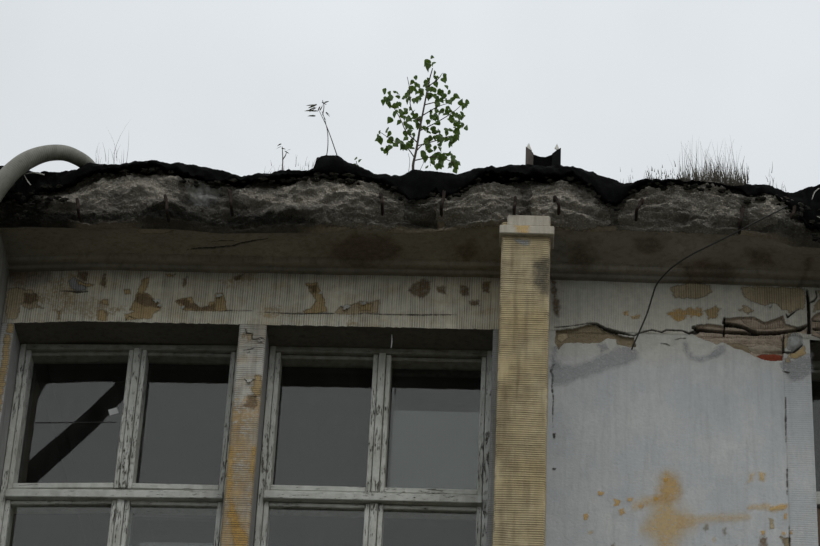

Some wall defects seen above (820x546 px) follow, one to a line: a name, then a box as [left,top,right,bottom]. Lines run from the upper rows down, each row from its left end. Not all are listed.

spalling [34,174,222,216]
spalling [237,178,405,232]
spalling [435,181,790,236]
peeling [124,278,161,320]
peeling [176,293,227,311]
peeling [303,282,379,314]
peeling [408,279,445,297]
peeling [671,283,712,299]
spalling [555,325,636,350]
crack [556,291,820,373]
spalling [668,286,820,363]
peeling [244,375,262,409]